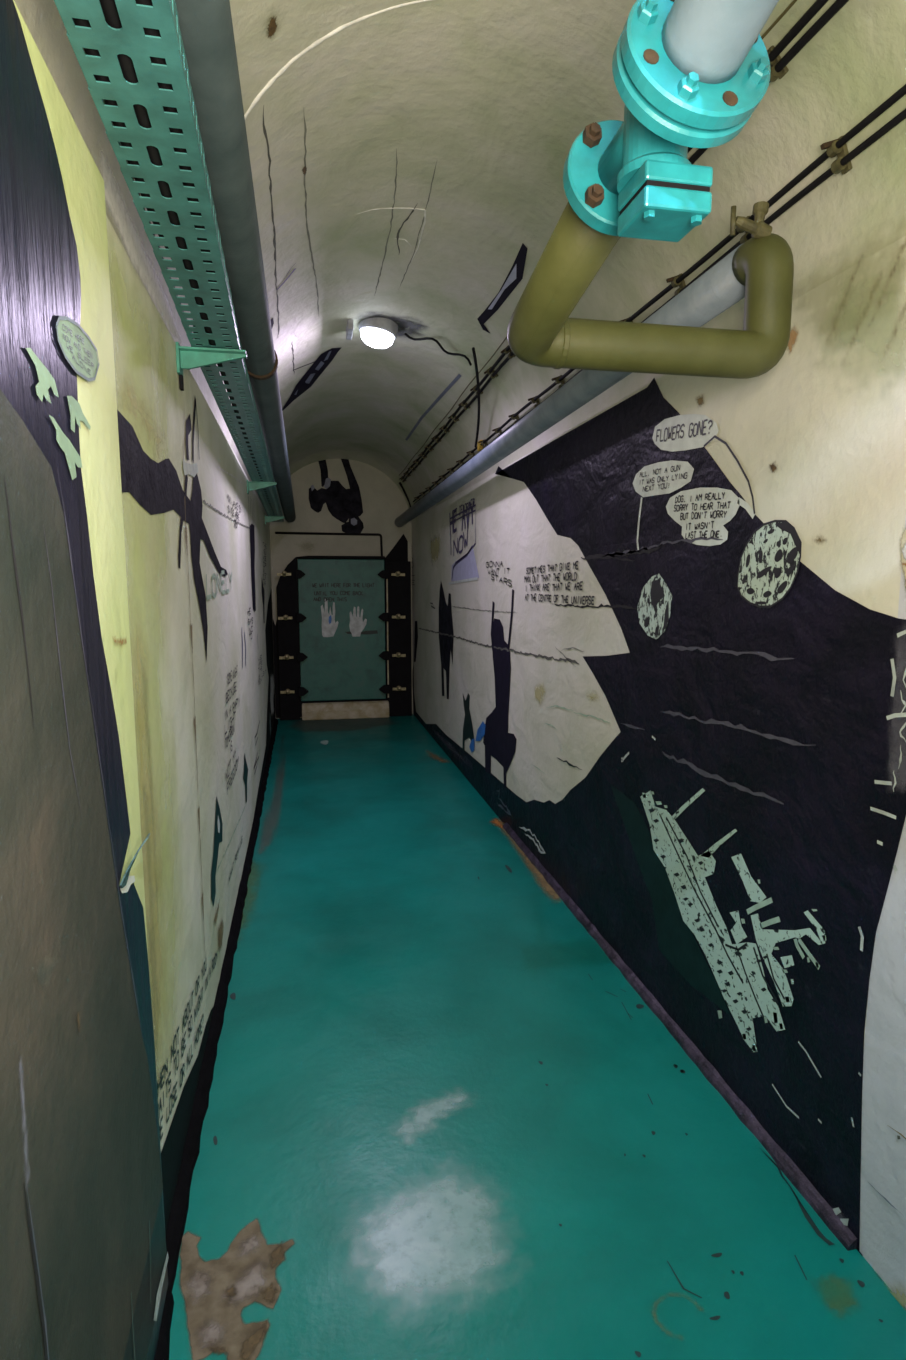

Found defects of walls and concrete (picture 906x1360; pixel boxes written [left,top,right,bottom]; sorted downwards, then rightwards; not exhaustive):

crack [263,107,319,373]
crack [374,148,437,296]
peeling [154,1219,294,1360]